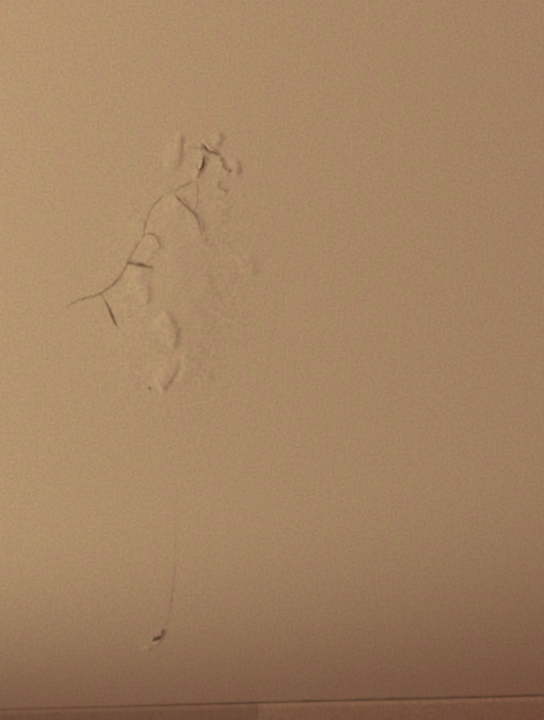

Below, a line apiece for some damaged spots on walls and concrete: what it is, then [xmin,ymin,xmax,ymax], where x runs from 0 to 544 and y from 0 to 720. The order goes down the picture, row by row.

peeling [183,115,254,196]